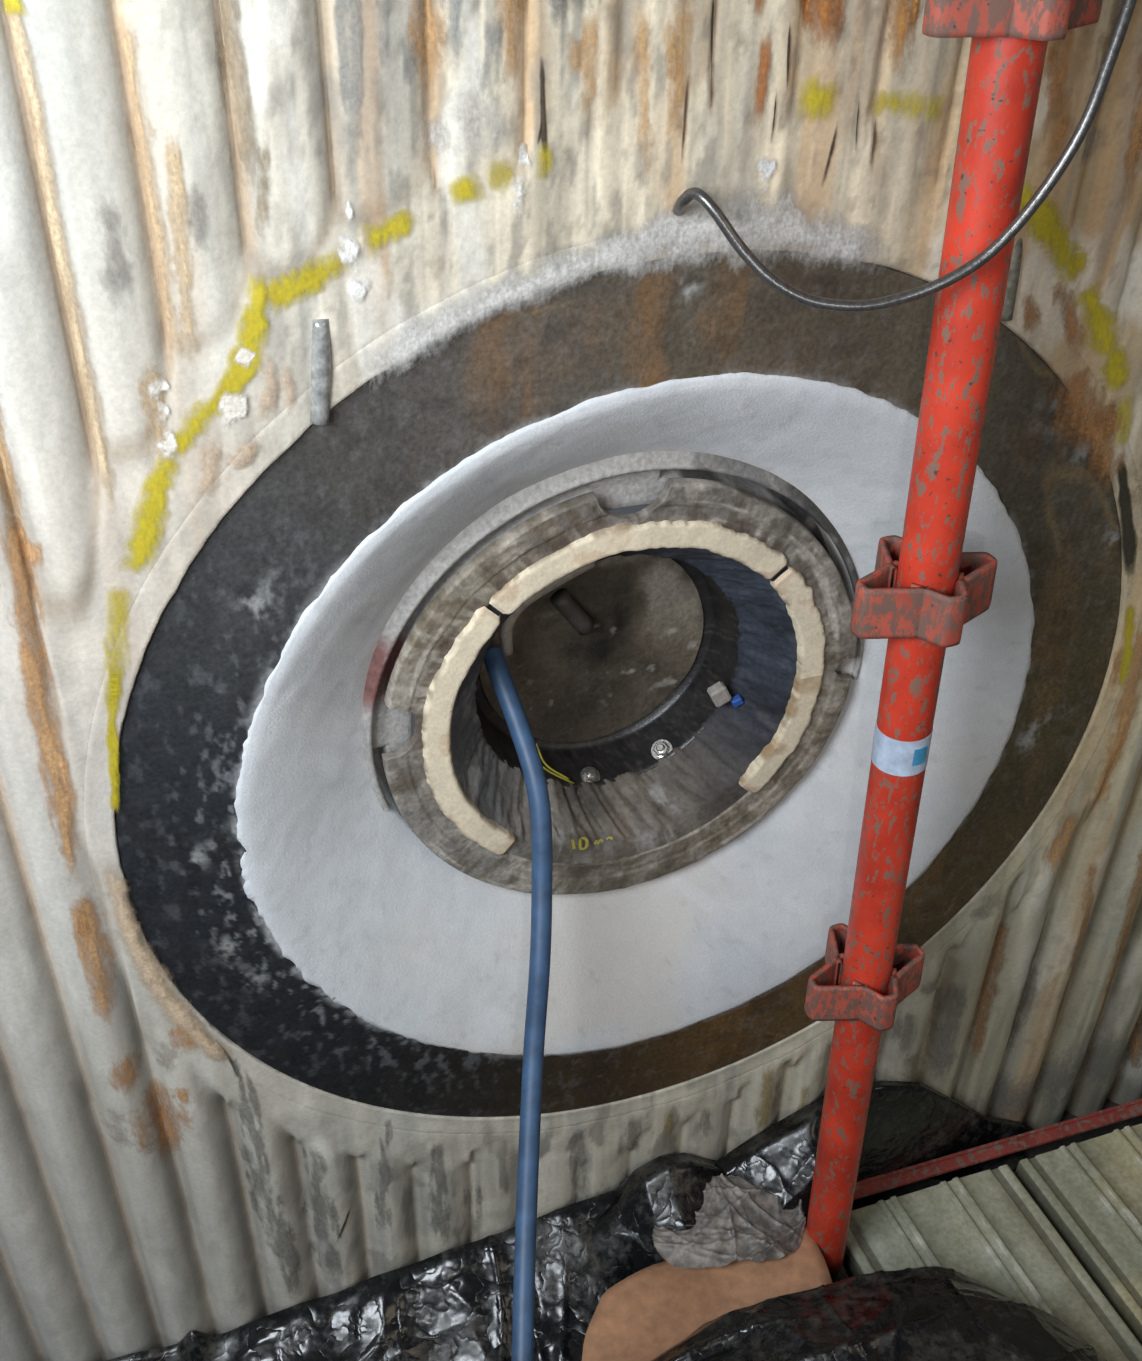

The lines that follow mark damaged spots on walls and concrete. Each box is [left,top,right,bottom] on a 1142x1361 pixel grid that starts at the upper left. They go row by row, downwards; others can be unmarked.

rust [801,0,843,36]
rust [756,43,771,112]
rust [1025,297,1037,327]
rust [1056,289,1078,341]
rust [1054,371,1123,476]
rust [1096,634,1142,799]
rust [73,900,111,1015]
rust [973,924,1005,1050]
water stain [234,1063,299,1288]
water stain [303,1152,340,1269]
water stain [376,1125,390,1218]
water stain [432,1148,449,1234]